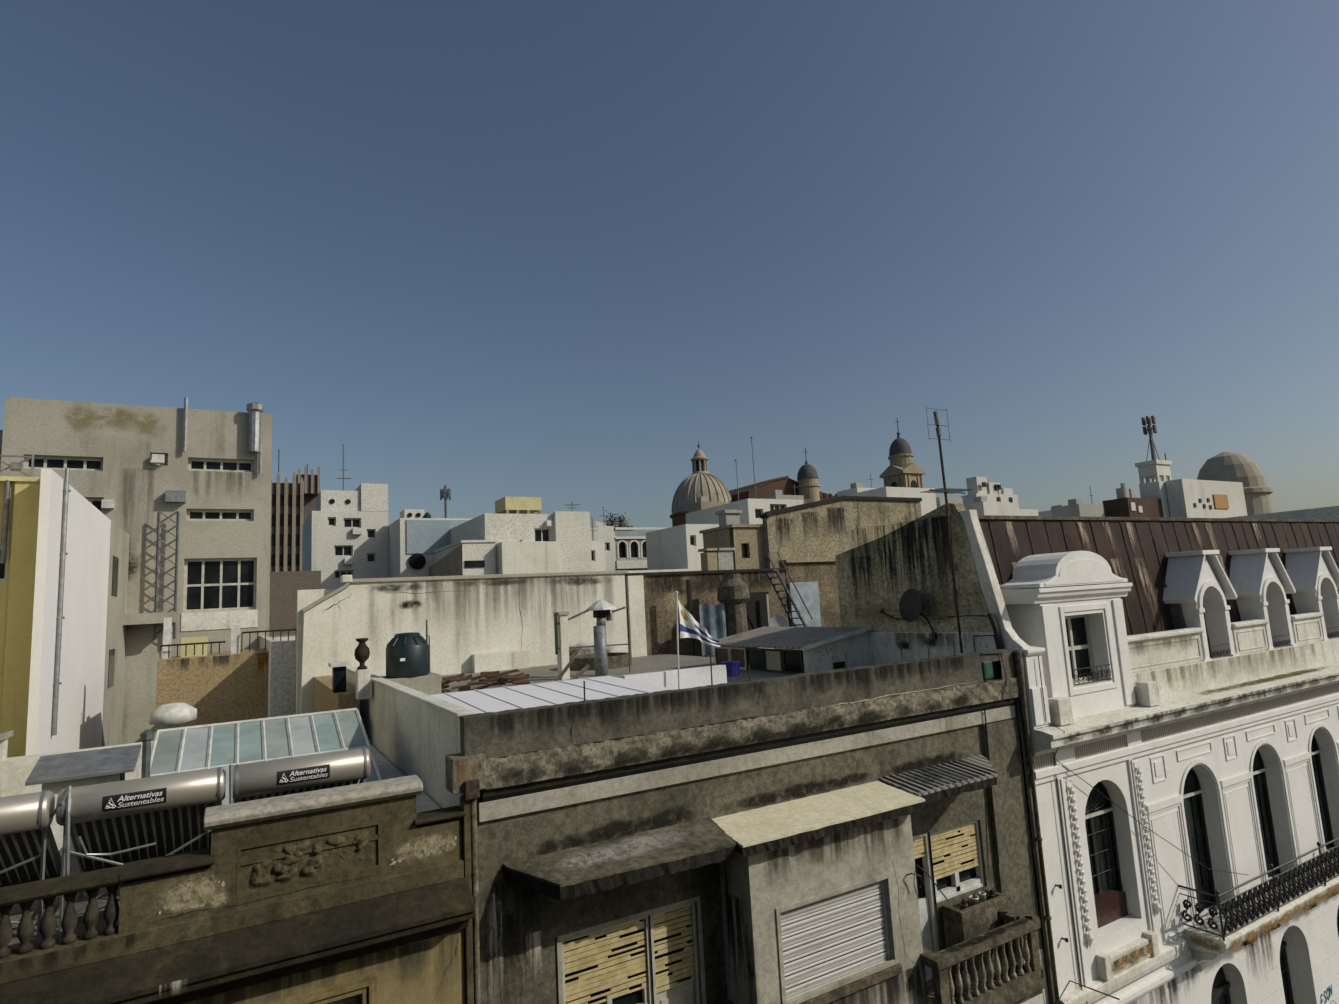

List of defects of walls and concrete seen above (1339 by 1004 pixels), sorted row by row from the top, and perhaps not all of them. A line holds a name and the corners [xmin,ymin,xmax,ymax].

water stain [778,508,844,534]
water stain [851,516,952,578]
water stain [927,694,969,710]
water stain [493,713,513,731]
water stain [562,705,910,774]
corrosion [1192,884,1339,952]
water stain [828,965,925,1004]